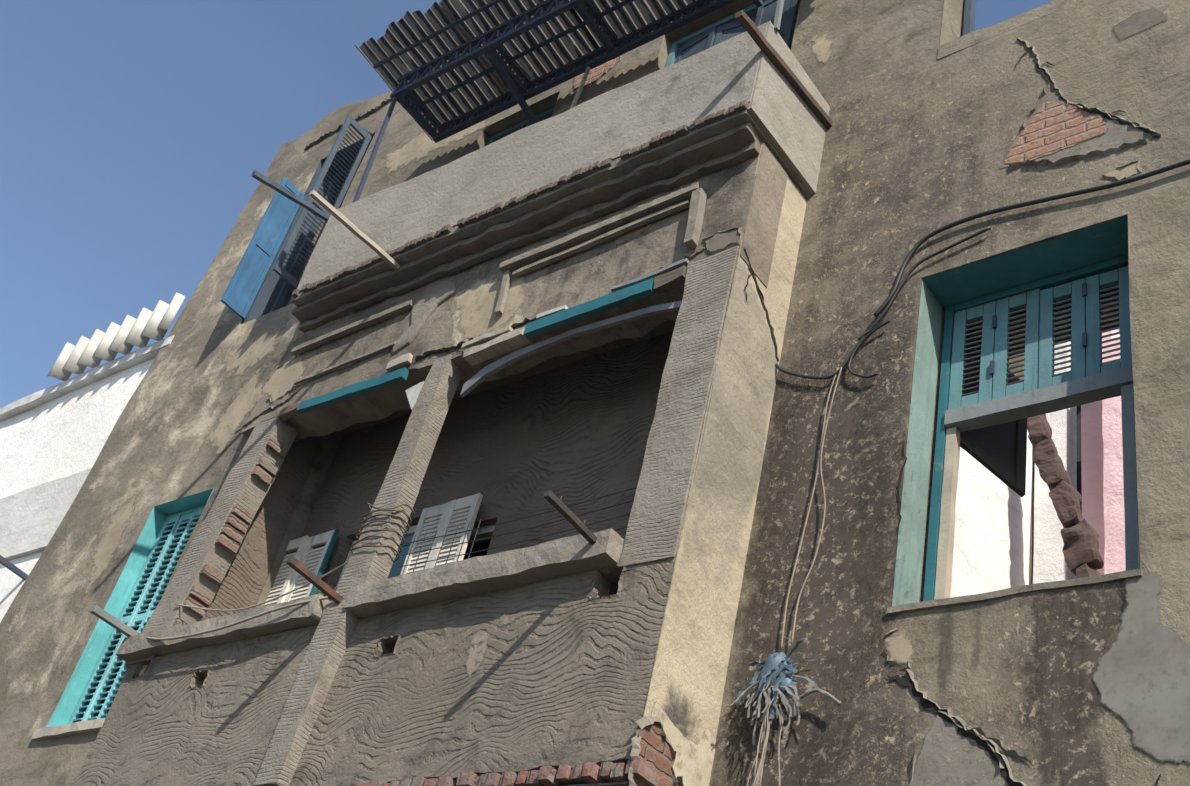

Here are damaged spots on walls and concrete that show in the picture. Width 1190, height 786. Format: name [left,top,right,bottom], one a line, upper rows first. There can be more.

crack [1015,38,1161,137]
flaking render [386,120,490,173]
flaking render [999,80,1161,181]
flaking render [612,222,651,246]
flaking render [702,227,744,254]
flaking render [204,324,307,459]
flaking render [84,491,139,595]
flaking render [883,627,914,670]
water stain [939,613,951,686]
flaking render [628,701,715,786]
flaking render [908,710,1009,786]
crack [887,669,1033,786]